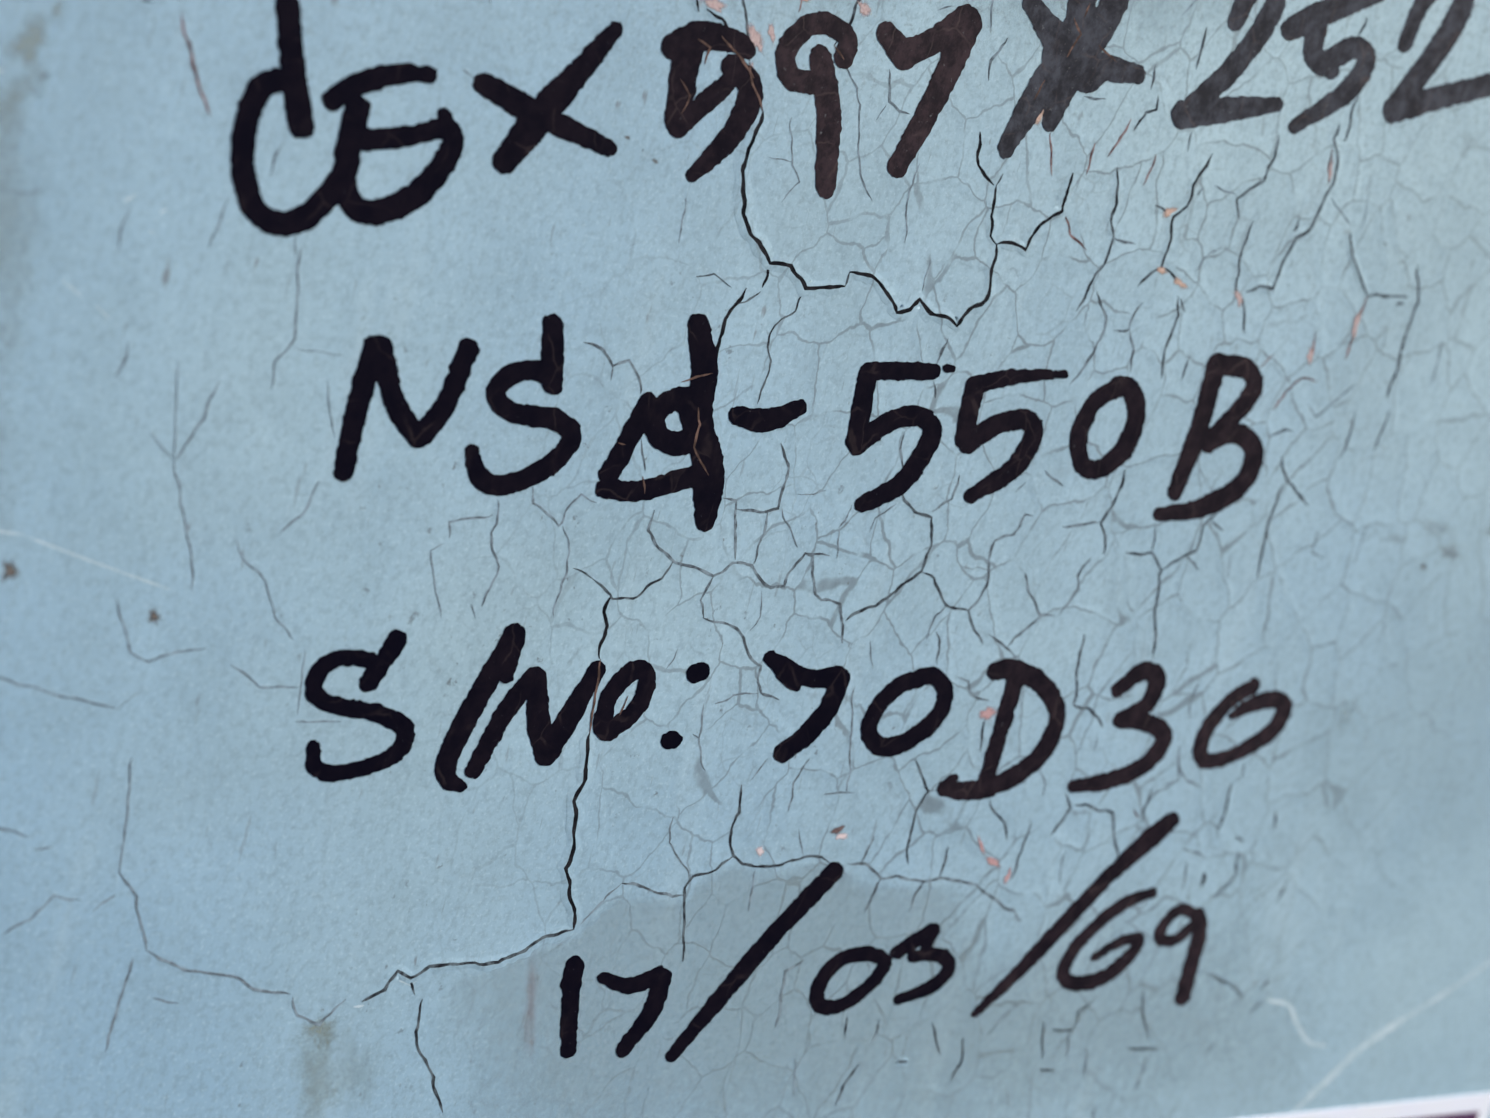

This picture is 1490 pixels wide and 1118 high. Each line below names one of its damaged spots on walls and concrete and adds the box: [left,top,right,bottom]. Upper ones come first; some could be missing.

crack [143,0,211,116]
crack [270,142,284,176]
crack [209,199,229,247]
crack [678,198,686,243]
crack [681,0,1420,577]
crack [115,342,129,377]
crack [271,235,344,436]
crack [584,342,642,394]
crack [150,361,222,591]
crack [0,407,1245,1118]
crack [1270,811,1280,830]
crack [1206,973,1272,1013]